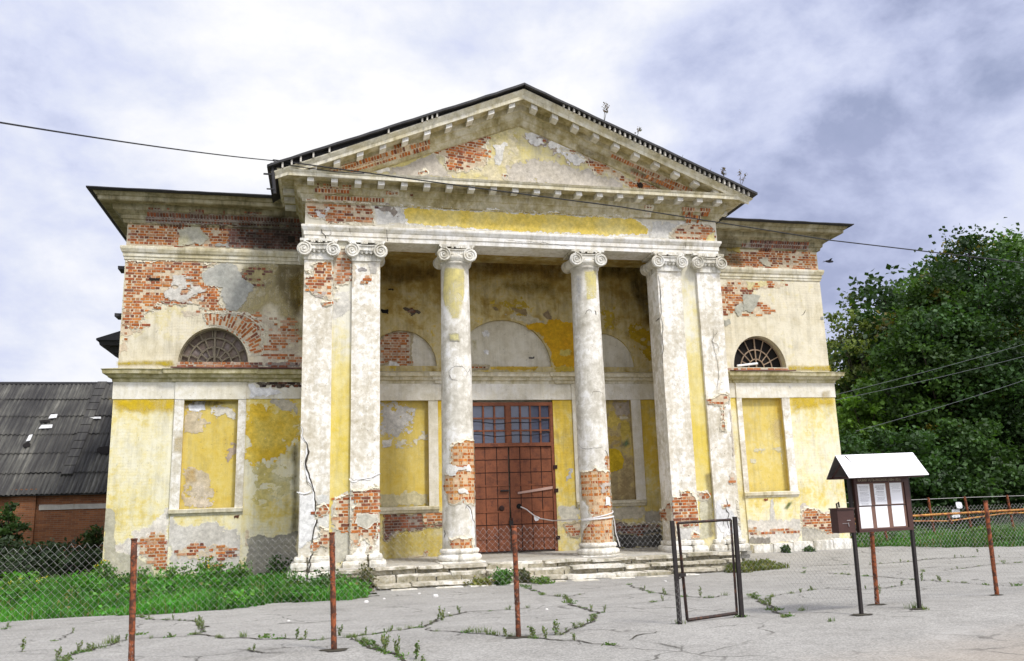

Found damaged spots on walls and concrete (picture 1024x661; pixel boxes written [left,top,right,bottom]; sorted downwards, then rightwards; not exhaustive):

flaking render [502,132,692,191]
flaking render [127,183,716,250]
flaking render [119,259,303,367]
flaking render [304,247,377,320]
flaking render [721,240,818,317]
peeling [184,401,236,434]
peeling [380,401,428,449]
peeling [181,467,215,509]
crack [297,426,320,576]
flaking render [310,437,476,555]
flaking render [558,456,833,543]
peeling [115,507,249,574]